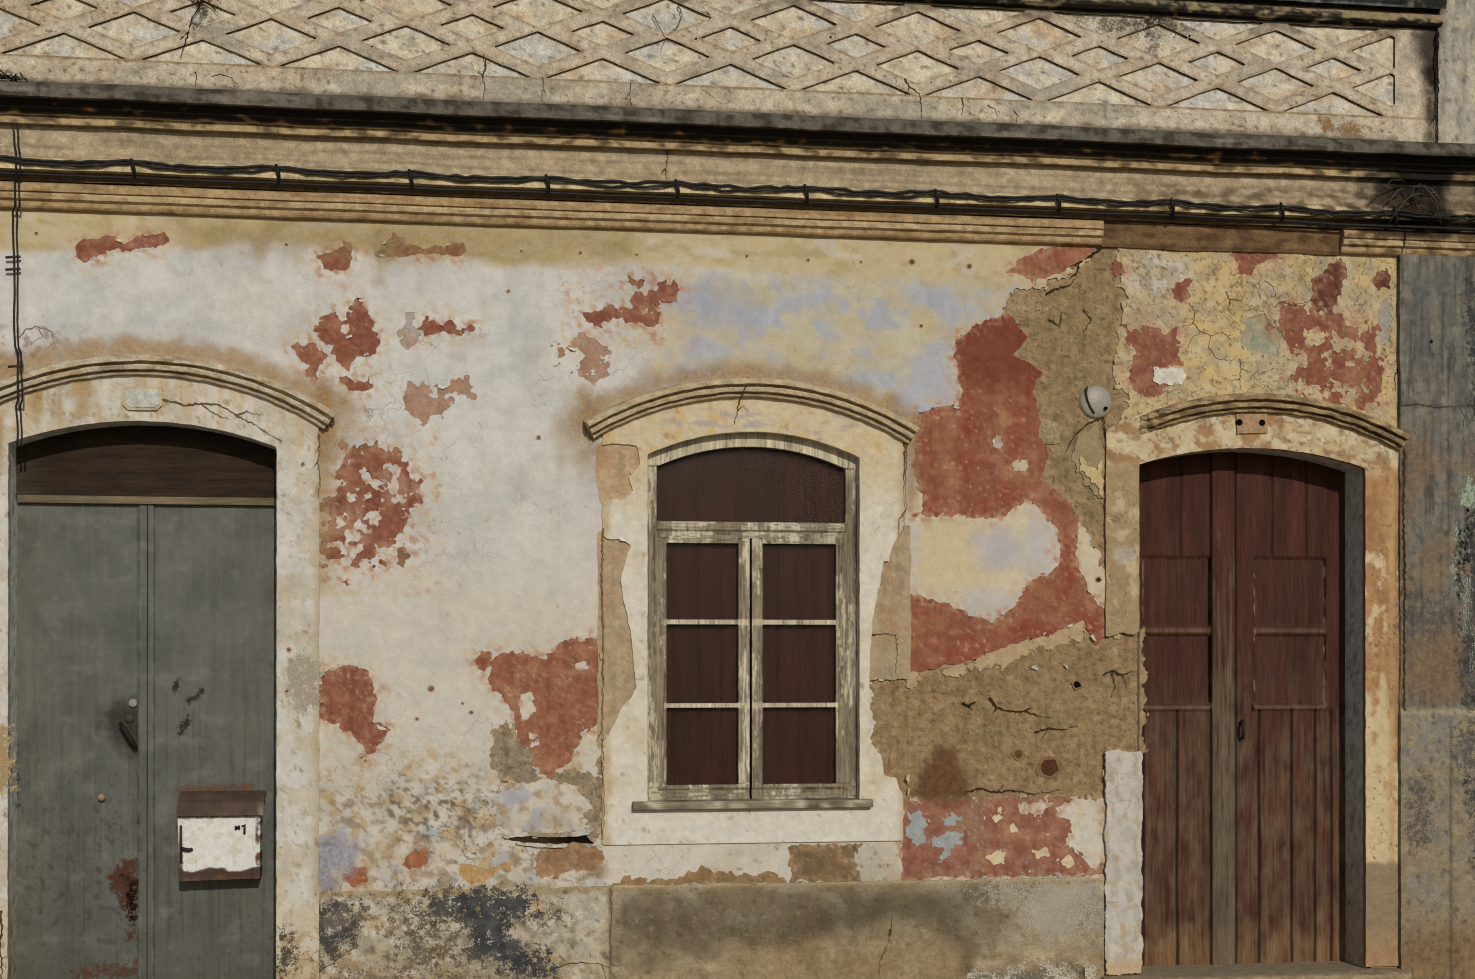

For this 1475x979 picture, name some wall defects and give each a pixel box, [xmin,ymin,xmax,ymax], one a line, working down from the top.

peeling [291,293,475,392]
crack [1182,280,1316,390]
crack [1394,367,1473,427]
leakage [1462,277,1475,423]
peeling [319,439,424,587]
spalling [869,245,1184,880]
peeling [458,531,636,886]
crack [962,697,1076,737]
leakage [1394,509,1475,879]
crack [965,784,1060,795]
leakage [268,925,300,979]
leakage [319,837,572,979]